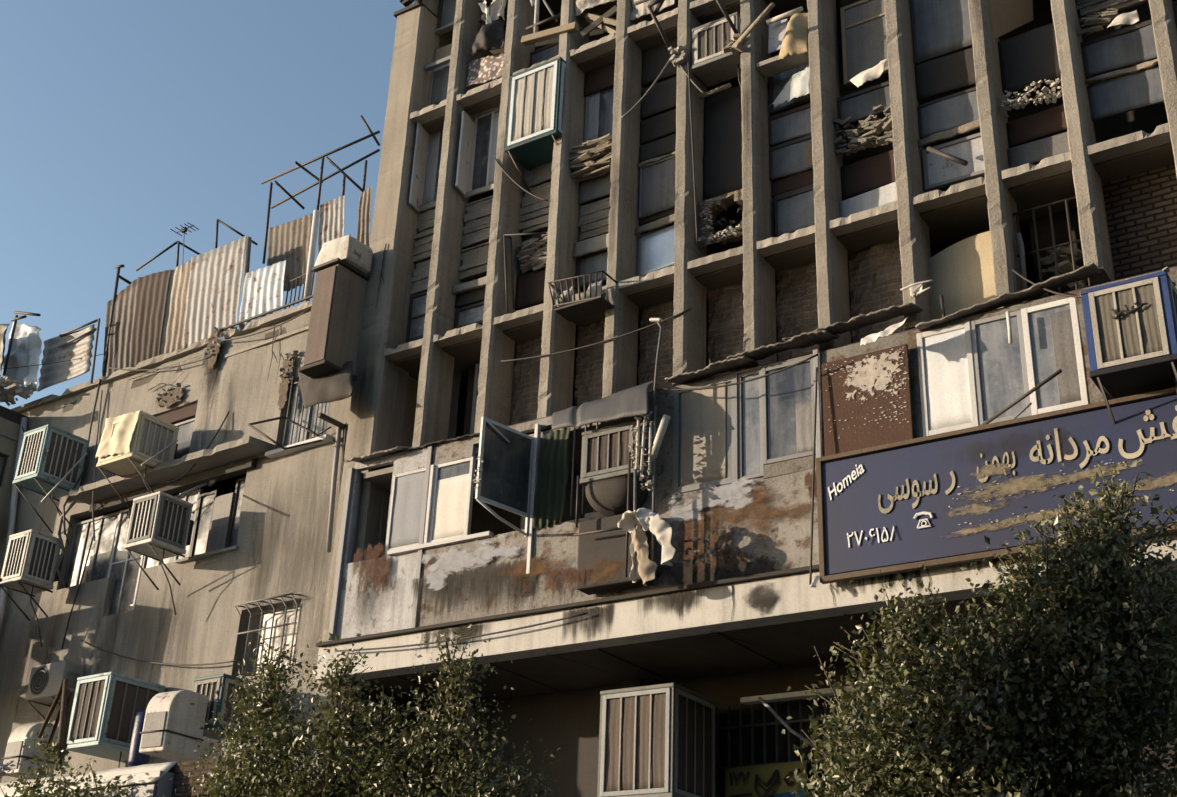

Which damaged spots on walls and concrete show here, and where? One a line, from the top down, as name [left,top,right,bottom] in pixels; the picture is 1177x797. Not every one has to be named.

peeling [825,347,909,432]
corrosion [349,543,391,609]
peeling [421,535,520,591]
corrosion [508,557,575,599]
damp [643,559,785,617]
damp [562,603,613,638]